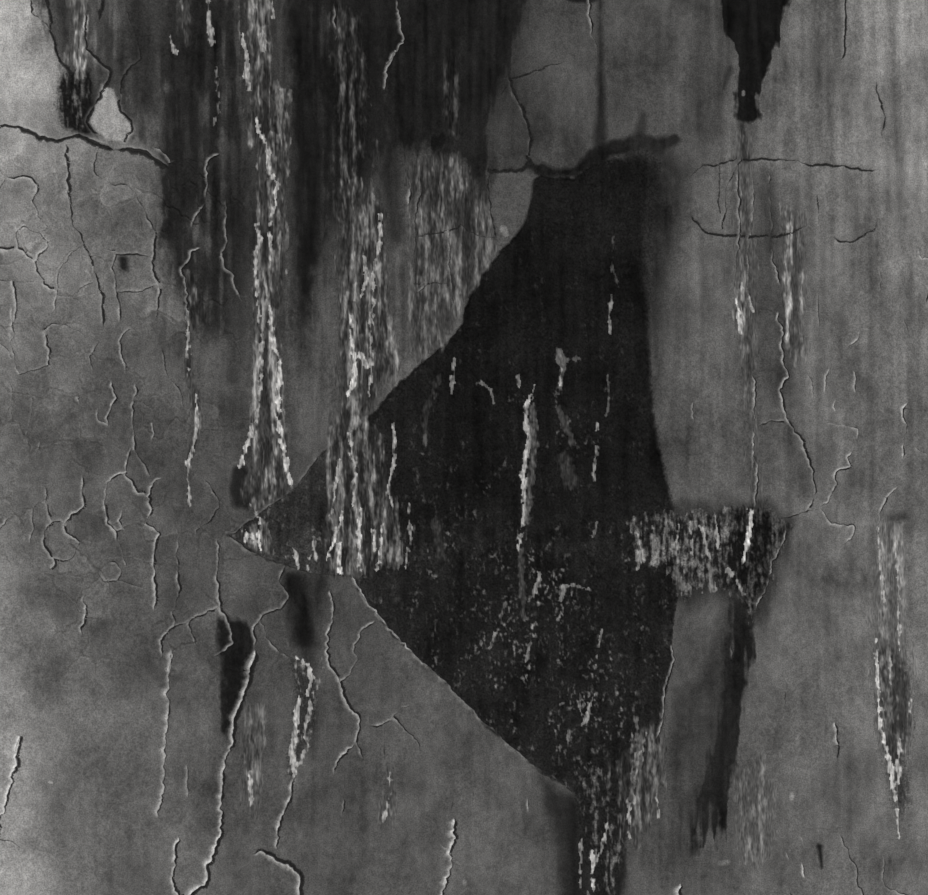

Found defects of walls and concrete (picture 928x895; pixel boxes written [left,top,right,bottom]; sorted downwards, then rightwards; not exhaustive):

crack [0,0,323,895]
spalling [226,449,327,575]
damp [32,0,531,765]
spalling [355,147,794,895]
damp [606,0,822,895]
crack [686,157,900,610]
damp [215,614,268,828]
spalling [284,656,325,785]
crack [322,574,560,784]
crack [435,788,474,895]
damp [529,769,596,895]
spalling [872,657,917,817]